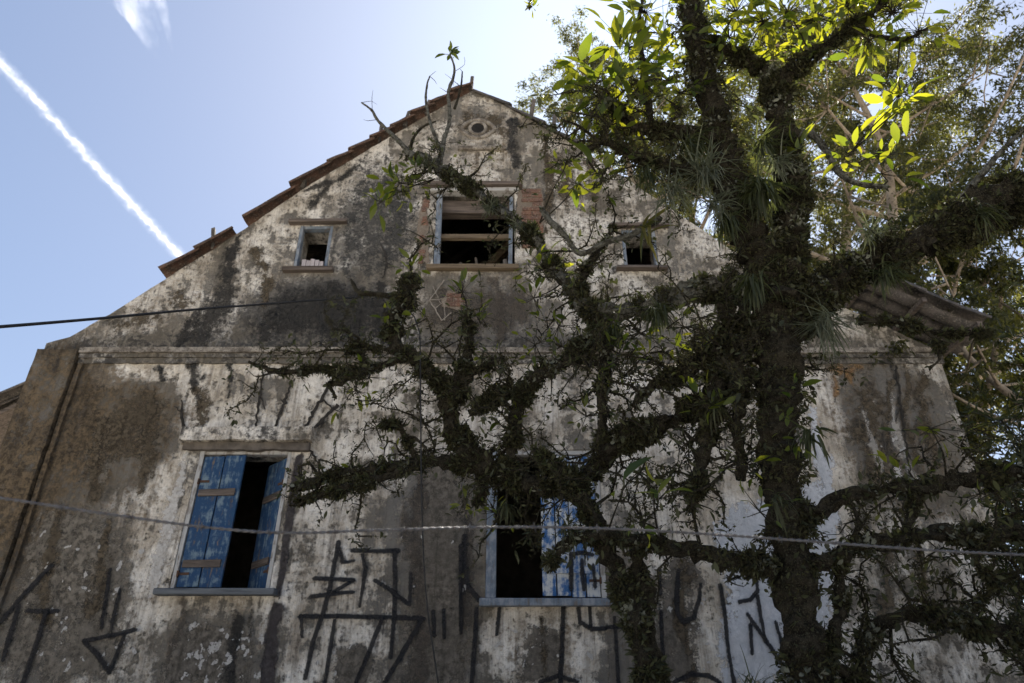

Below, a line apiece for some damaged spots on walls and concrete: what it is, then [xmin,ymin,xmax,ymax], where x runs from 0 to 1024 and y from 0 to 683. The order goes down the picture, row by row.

water stain [458,108,521,169]
flaking render [516,188,545,237]
water stain [167,162,420,347]
water stain [104,305,163,330]
water stain [186,363,213,427]
water stain [77,365,175,504]